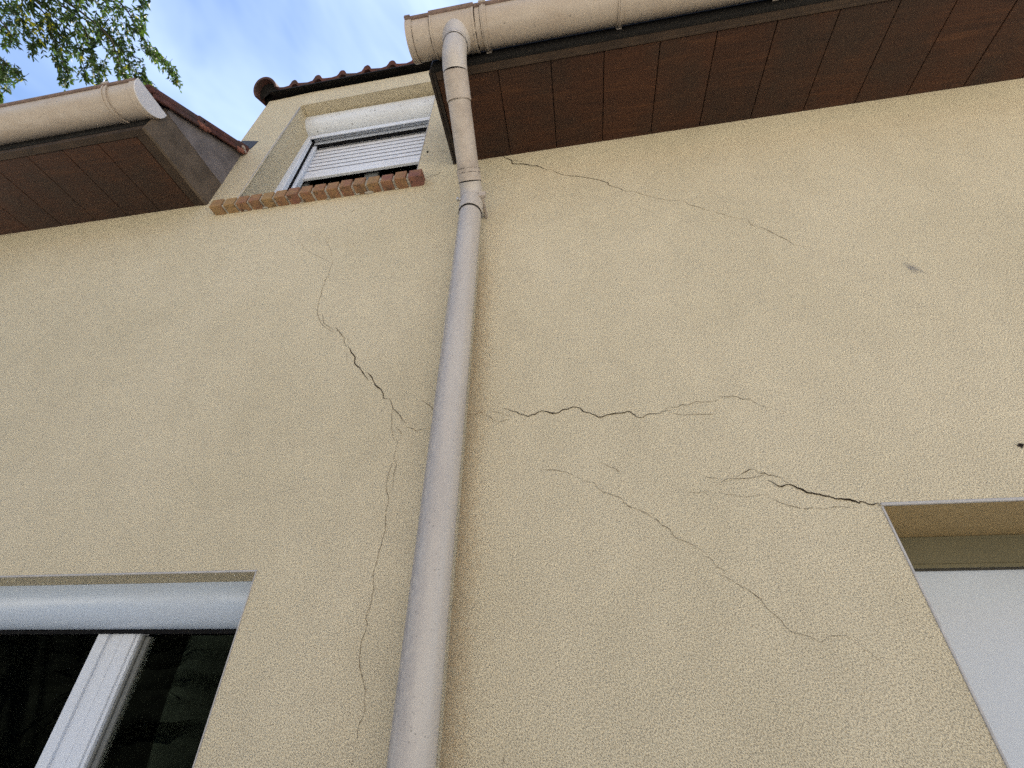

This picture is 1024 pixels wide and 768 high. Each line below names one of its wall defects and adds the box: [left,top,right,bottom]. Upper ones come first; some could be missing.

crack [302,224,432,761]
crack [465,396,762,422]
crack [544,462,880,660]